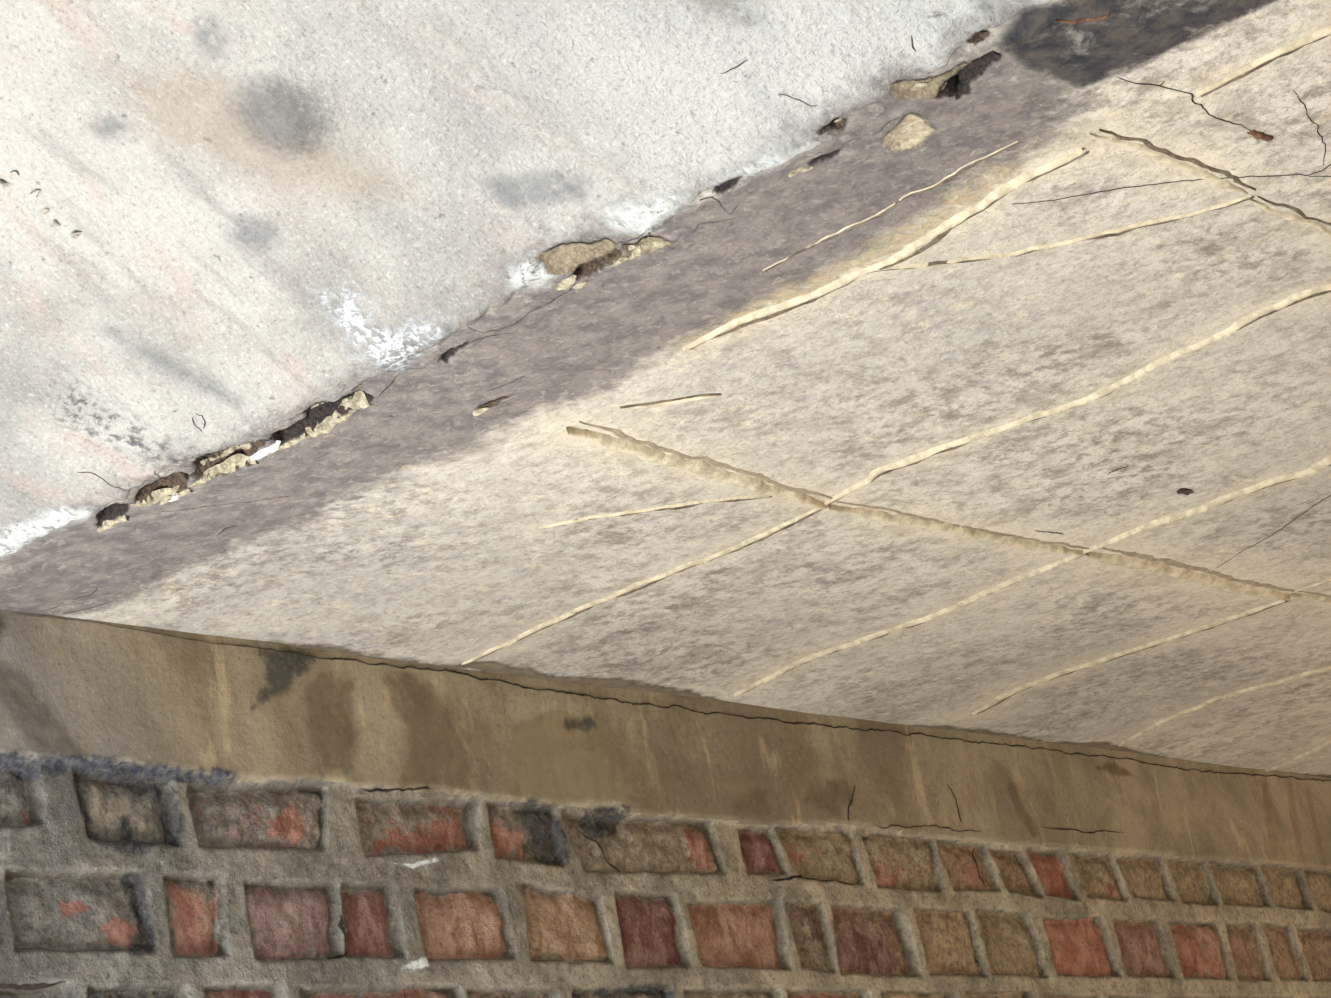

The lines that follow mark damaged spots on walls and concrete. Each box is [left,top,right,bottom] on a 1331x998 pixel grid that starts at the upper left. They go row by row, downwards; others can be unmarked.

spalling [712,175,741,193]
peeling [883,31,1001,150]
crack [1013,92,1331,205]
crack [1117,77,1251,131]
spalling [536,236,676,291]
leakage [0,0,1275,634]
spalling [96,390,373,533]
leakage [0,670,235,854]
crack [364,785,433,793]
leakage [253,642,716,788]
crack [11,588,1331,782]
leakage [394,857,439,869]